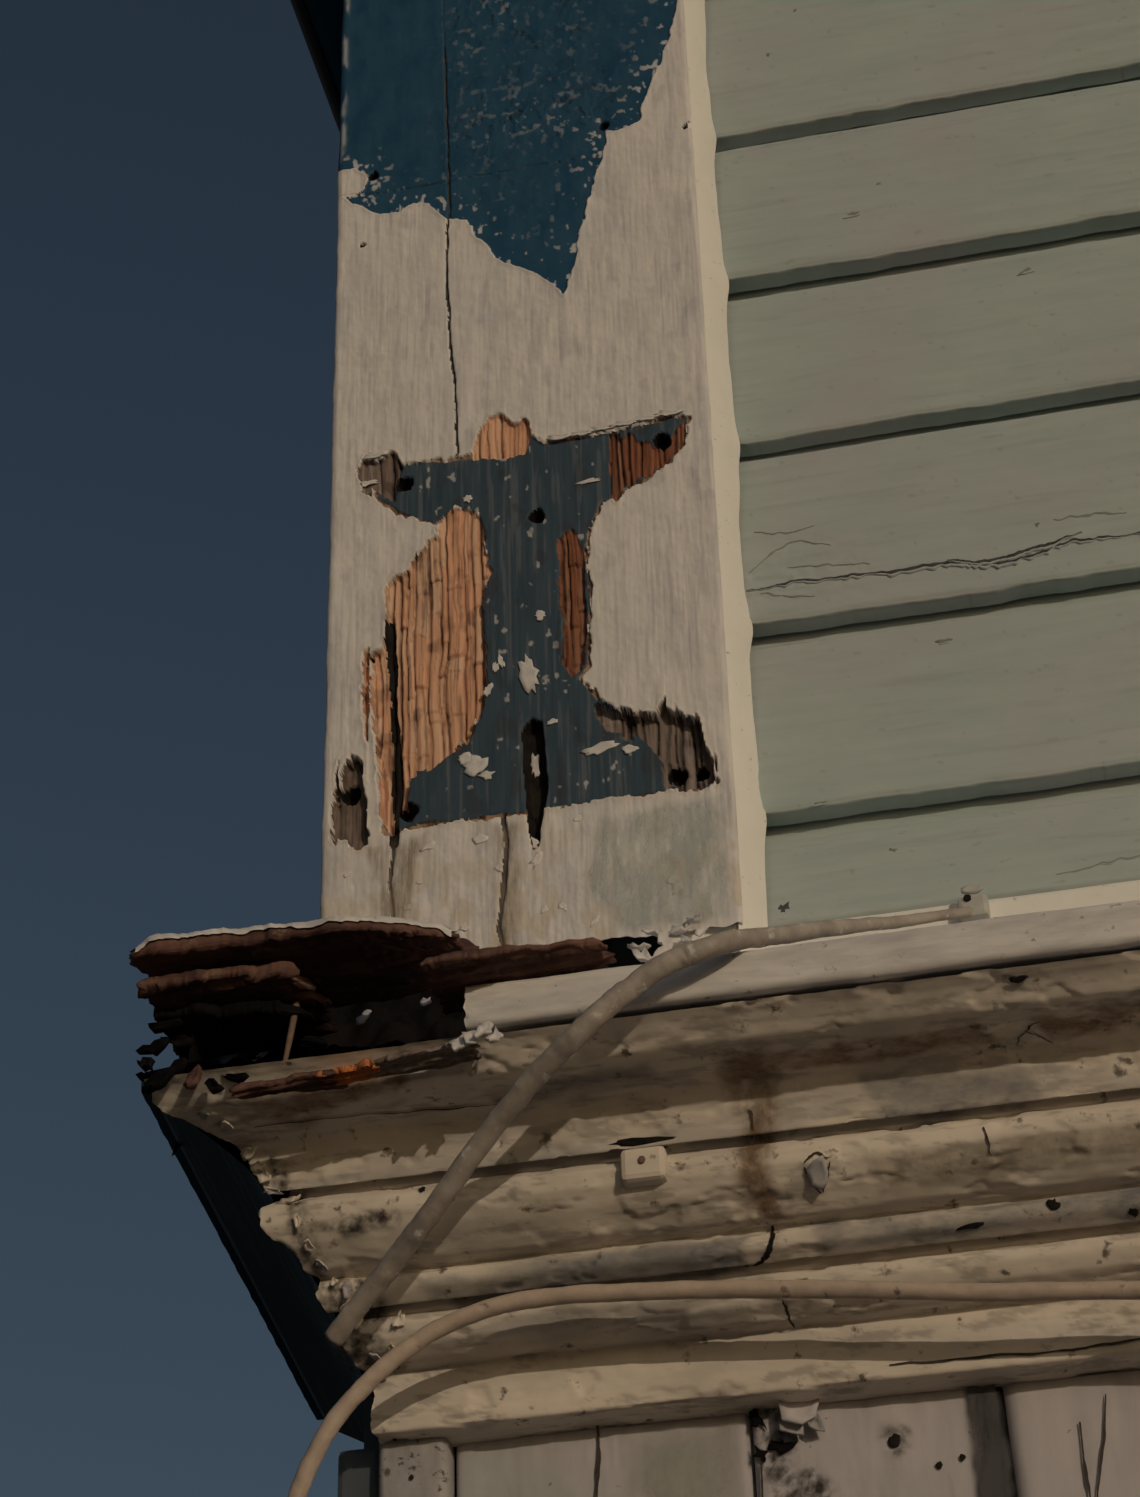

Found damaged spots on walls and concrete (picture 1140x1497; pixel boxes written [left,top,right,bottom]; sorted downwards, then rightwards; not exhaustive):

peeling [338,0,677,294]
crack [420,46,459,456]
crack [747,512,1140,598]
peeling [330,409,720,869]
peeling [356,1009,372,1025]
damp [269,1157,364,1322]
damp [341,1212,388,1235]
damp [335,1301,385,1369]
crack [889,1338,1140,1366]
damp [768,1467,825,1497]